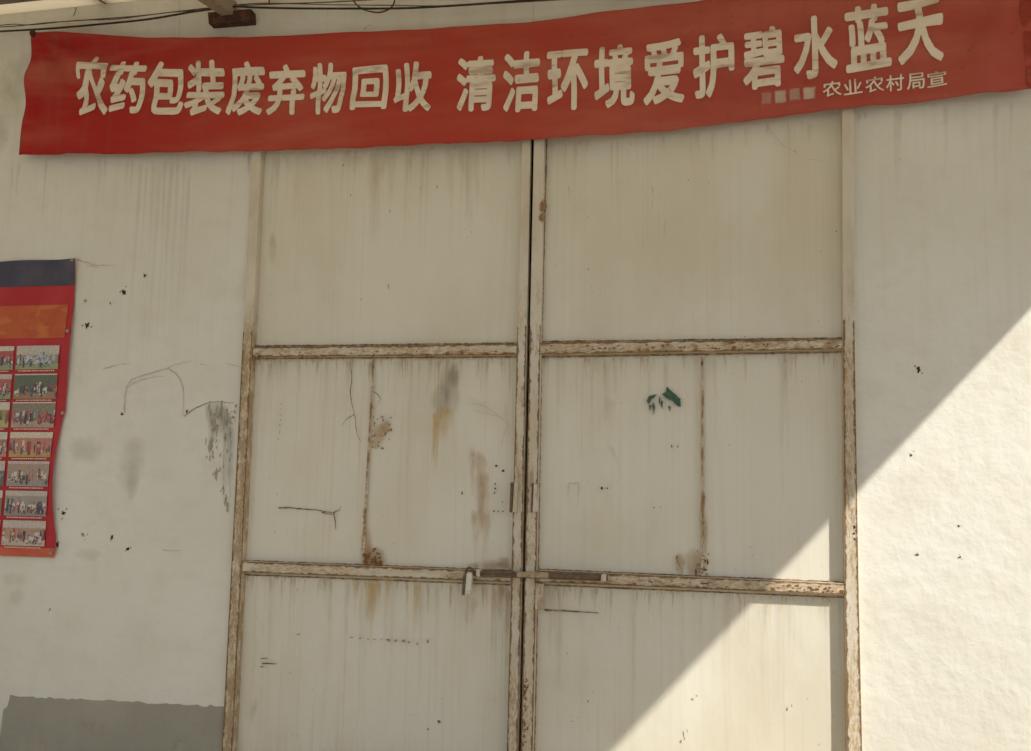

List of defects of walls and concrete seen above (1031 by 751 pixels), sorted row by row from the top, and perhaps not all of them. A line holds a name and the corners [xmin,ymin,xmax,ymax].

corrosion [222,139,862,751]